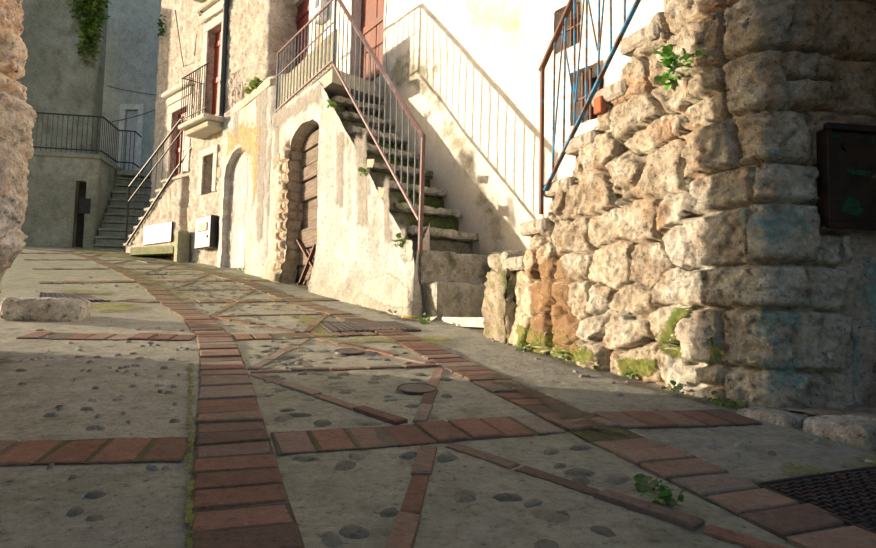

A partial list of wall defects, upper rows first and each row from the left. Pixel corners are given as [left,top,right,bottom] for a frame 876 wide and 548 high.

water stain [393,59,440,109]
water stain [447,122,473,178]